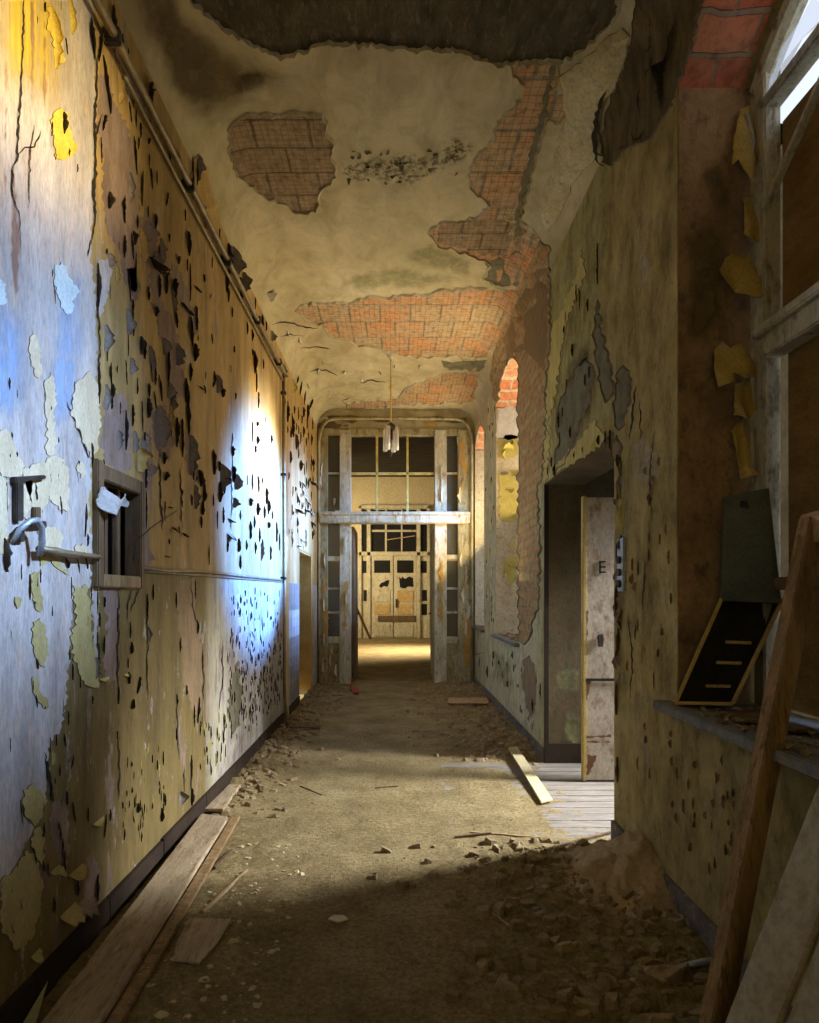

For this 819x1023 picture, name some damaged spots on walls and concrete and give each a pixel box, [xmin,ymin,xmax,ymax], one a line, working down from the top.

crack [11,1,41,247]
peeling [732,105,756,182]
peeling [0,0,349,963]
spalling [189,0,632,730]
peeling [714,342,758,479]
peeling [720,251,765,299]